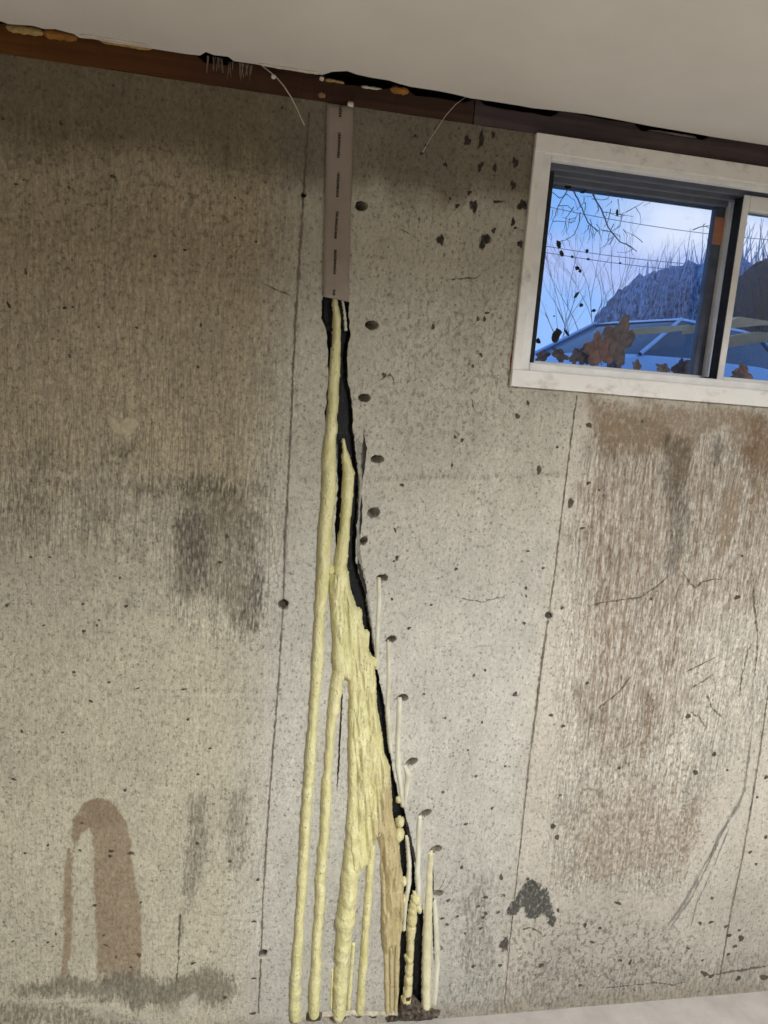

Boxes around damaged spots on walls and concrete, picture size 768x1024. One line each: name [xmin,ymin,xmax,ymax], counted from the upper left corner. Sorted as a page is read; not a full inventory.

crack [321,297,445,1011]
water stain [22,801,232,1024]
water stain [507,878,556,927]